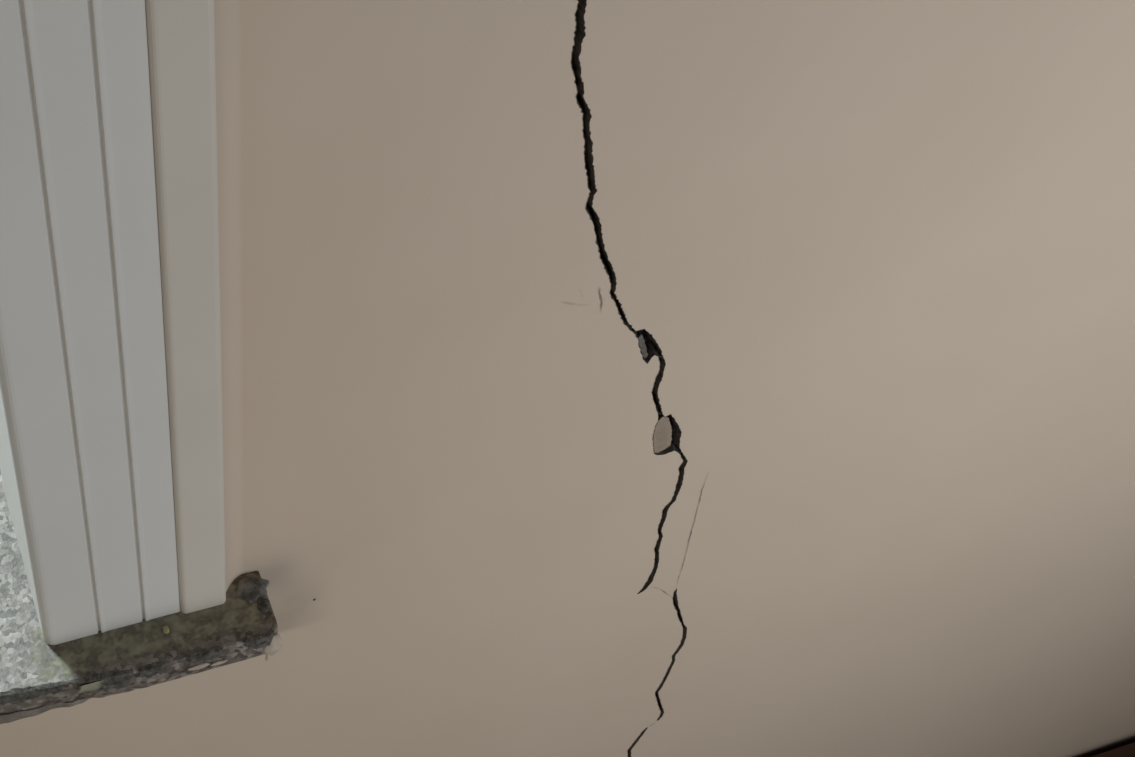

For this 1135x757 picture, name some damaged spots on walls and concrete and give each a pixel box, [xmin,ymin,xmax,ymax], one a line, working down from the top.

crack [571,0,635,331]
crack [651,357,666,414]
crack [627,453,688,757]